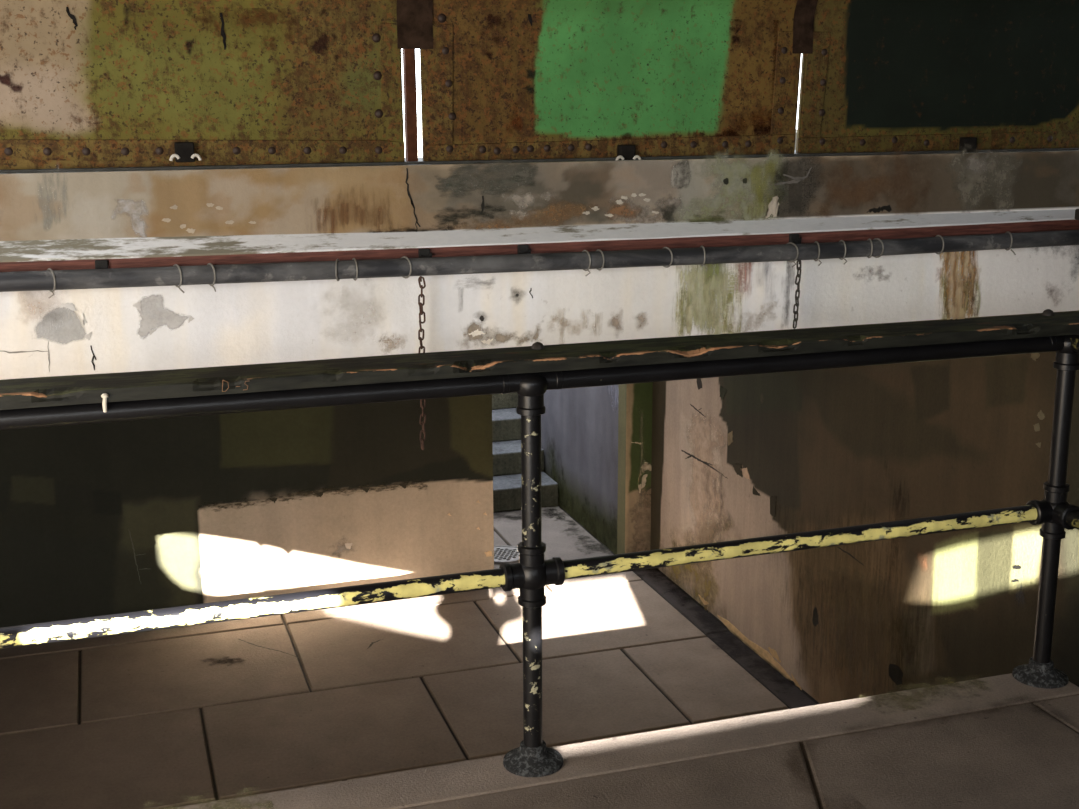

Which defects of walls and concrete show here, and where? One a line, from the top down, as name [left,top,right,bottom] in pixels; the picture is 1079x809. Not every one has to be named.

corrosion [311,34,339,59]
corrosion [0,73,22,92]
crack [405,168,421,232]
leakage [371,161,537,233]
peeling [36,303,92,343]
peeling [133,295,194,337]
peeling [732,463,777,517]